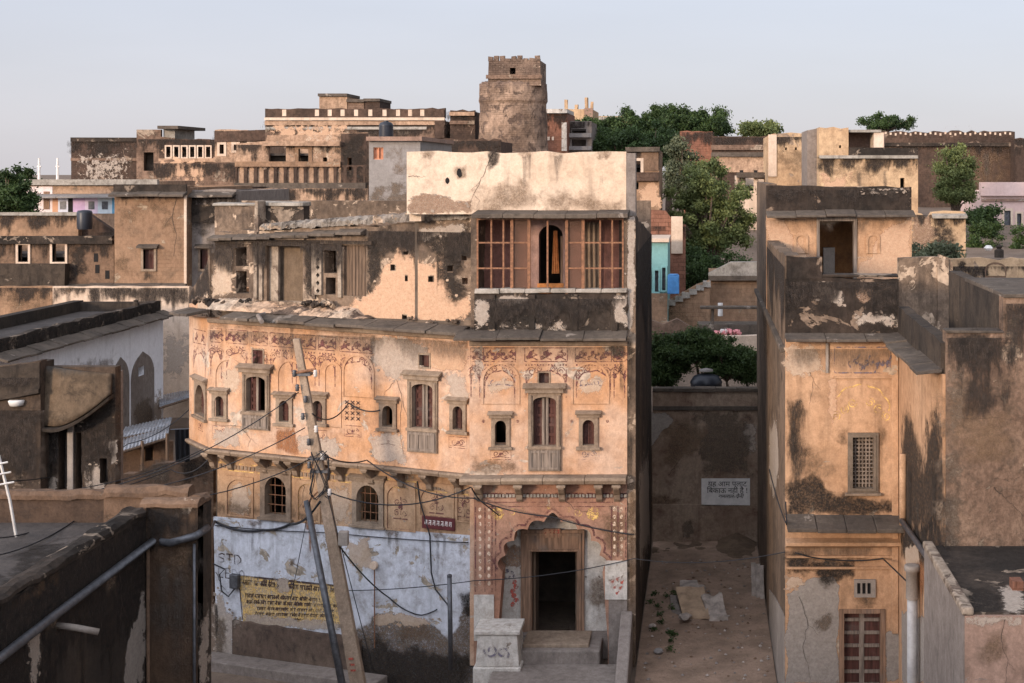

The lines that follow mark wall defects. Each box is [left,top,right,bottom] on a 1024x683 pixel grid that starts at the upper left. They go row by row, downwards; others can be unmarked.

spalling [77,152,127,179]
damp [0,125,471,353]
peeling [857,214,939,279]
peeling [350,247,529,329]
peeling [816,291,898,327]
damp [785,401,892,516]
damp [901,304,1024,568]
peeling [966,586,1024,626]